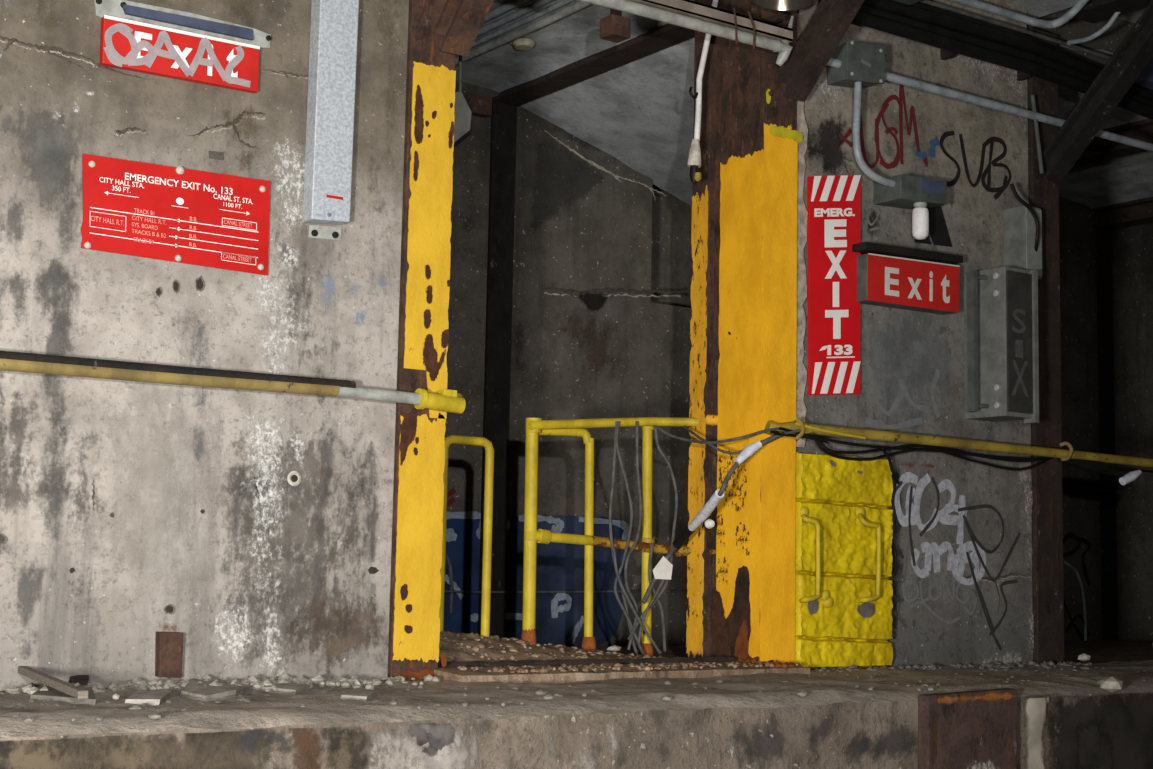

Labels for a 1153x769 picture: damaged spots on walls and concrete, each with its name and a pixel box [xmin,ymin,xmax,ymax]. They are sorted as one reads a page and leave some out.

crack [0,36,145,79]
crack [114,127,146,137]
crack [188,108,265,149]
peeling [413,84,437,181]
damp [0,260,76,356]
peeling [423,264,449,381]
damp [0,374,103,537]
damp [18,568,43,623]
damp [114,383,388,676]
peeling [711,450,750,657]
corrosion [401,653,447,681]
corrosion [931,693,1015,761]